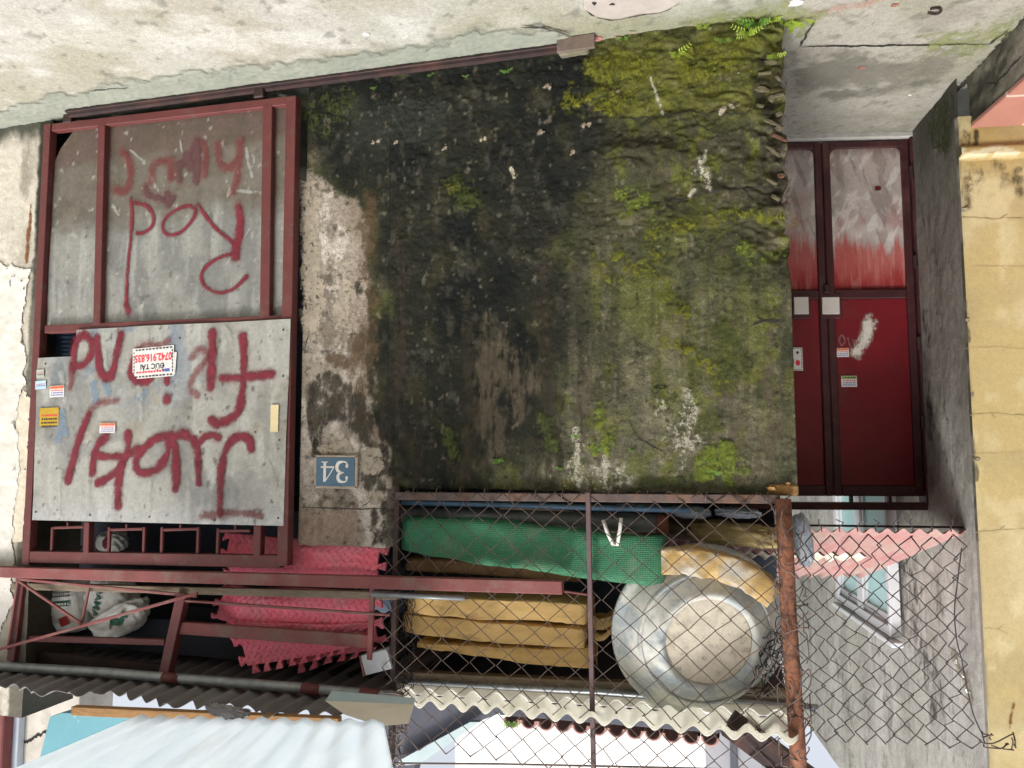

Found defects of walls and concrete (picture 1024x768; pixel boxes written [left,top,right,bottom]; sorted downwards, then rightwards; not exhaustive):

water stain [688,149,712,197]
water stain [306,193,423,545]
water stain [447,261,632,493]
water stain [655,387,701,476]